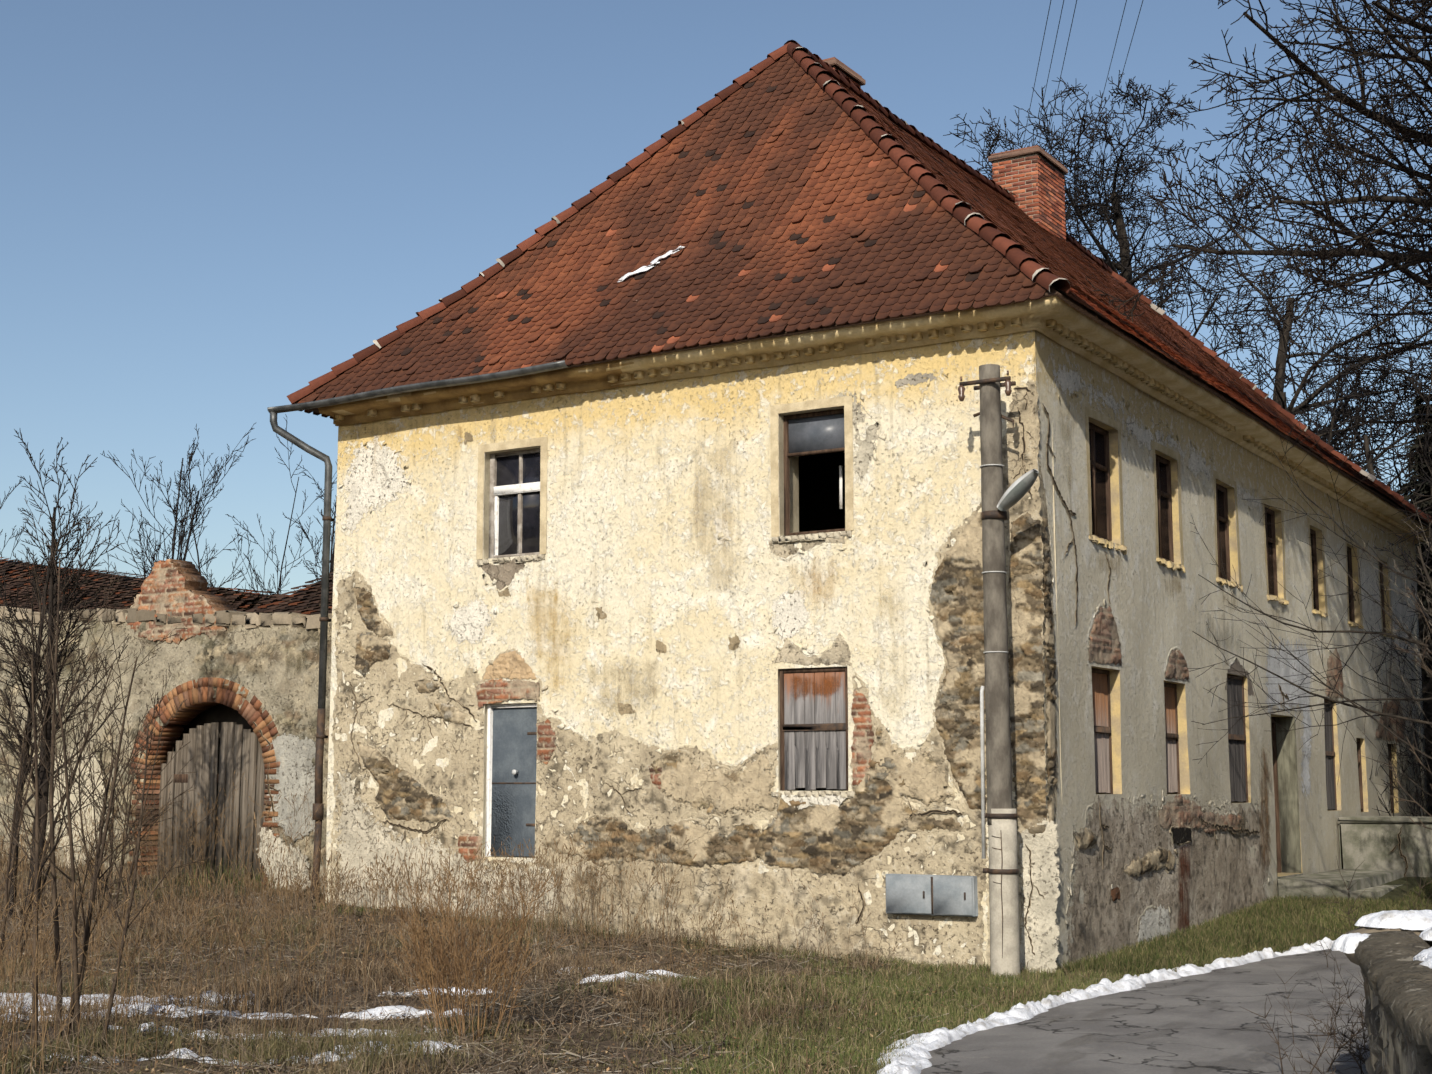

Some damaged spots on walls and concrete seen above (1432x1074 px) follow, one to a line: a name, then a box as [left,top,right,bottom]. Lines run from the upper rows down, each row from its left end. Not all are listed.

crack [1013,387,1111,626]
peeling [1052,364,1215,481]
flaking render [266,503,990,969]
flaking render [1002,380,1059,962]
flaking render [1087,599,1122,666]
flaking render [1164,646,1189,681]
flaking render [1224,656,1255,697]
flaking render [1054,790,1271,966]